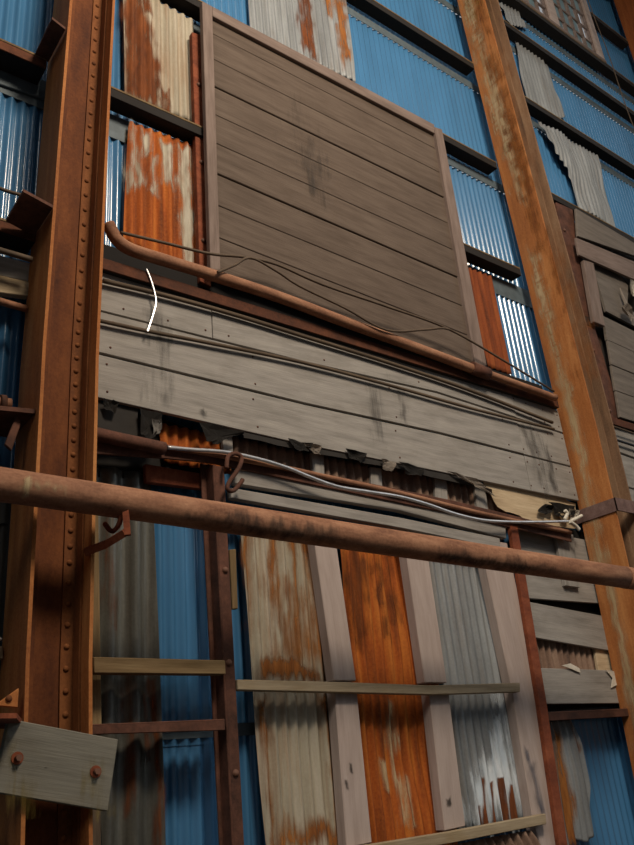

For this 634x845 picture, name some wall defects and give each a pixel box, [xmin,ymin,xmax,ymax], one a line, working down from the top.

corrosion [123,0,194,122]
corrosion [297,0,316,59]
corrosion [326,0,351,65]
corrosion [123,121,196,263]
corrosion [468,268,512,374]
spalling [620,279,634,321]
peeling [97,398,162,439]
corrosion [232,437,310,471]
corrosion [324,456,433,496]
spalling [199,422,580,529]
corrosion [340,549,439,685]
corrosion [357,694,456,844]